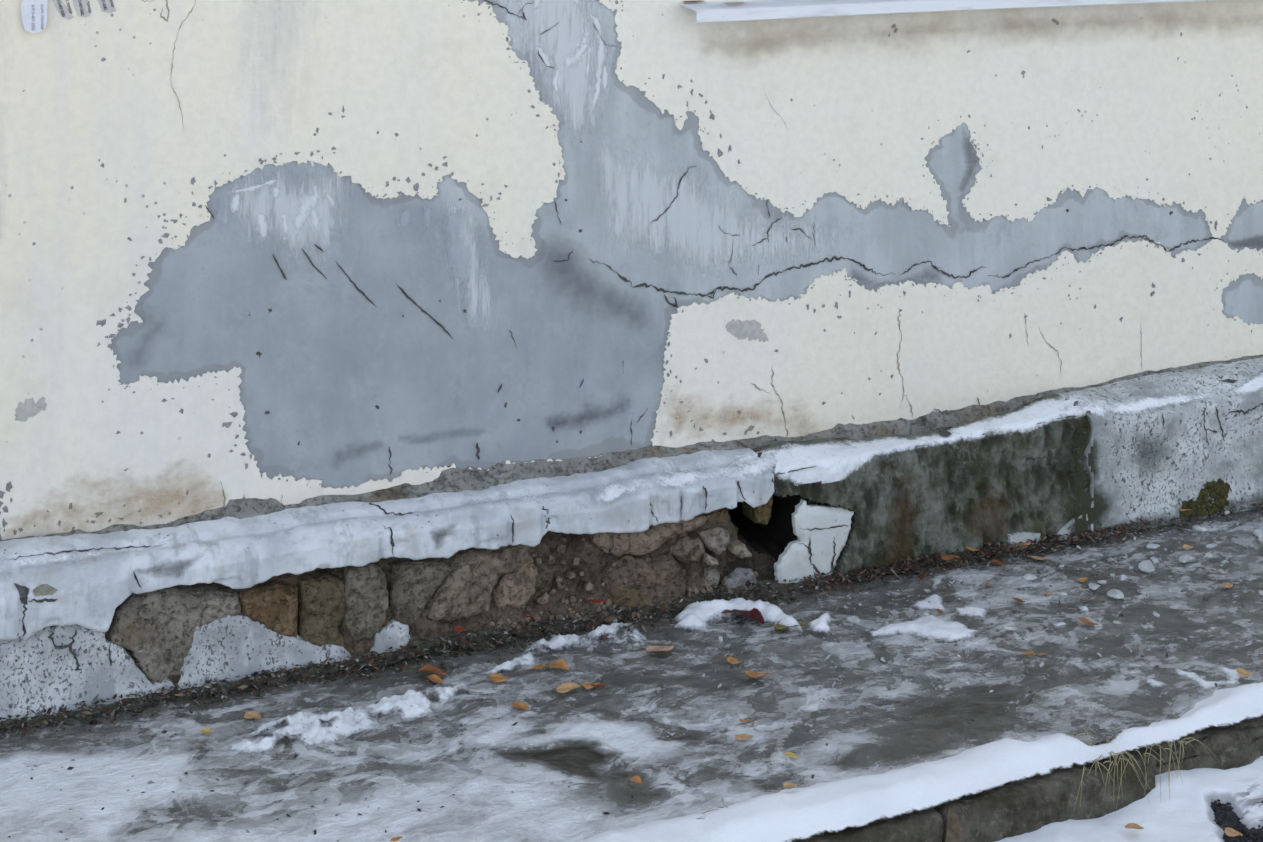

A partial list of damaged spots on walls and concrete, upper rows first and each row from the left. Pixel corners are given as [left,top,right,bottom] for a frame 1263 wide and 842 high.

crack [142,0,196,129]
peeling [96,0,1263,488]
crack [554,200,1224,308]
peeling [15,397,47,422]
crack [897,311,941,419]
crack [1024,312,1062,370]
peeling [47,503,143,531]
spalling [105,394,1091,694]